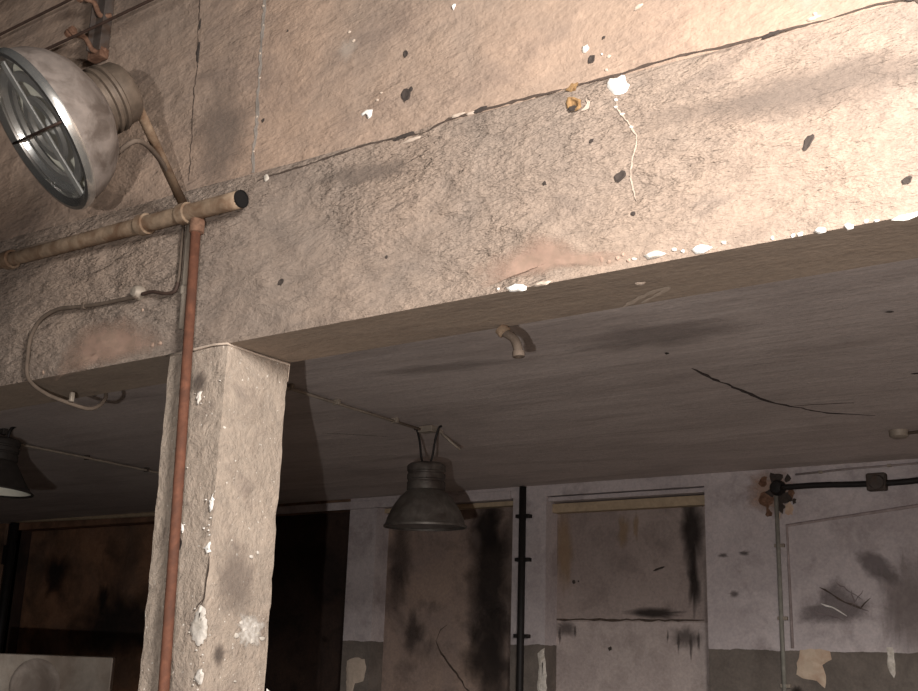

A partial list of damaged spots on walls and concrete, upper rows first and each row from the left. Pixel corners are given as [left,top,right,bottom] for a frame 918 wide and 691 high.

crack [258,0,918,181]
crack [692,368,875,416]
water stain [690,561,699,602]
peeling [188,605,211,686]
peeling [234,616,265,645]
water stain [470,627,506,691]
peeling [796,649,832,688]
peeling [886,647,896,677]